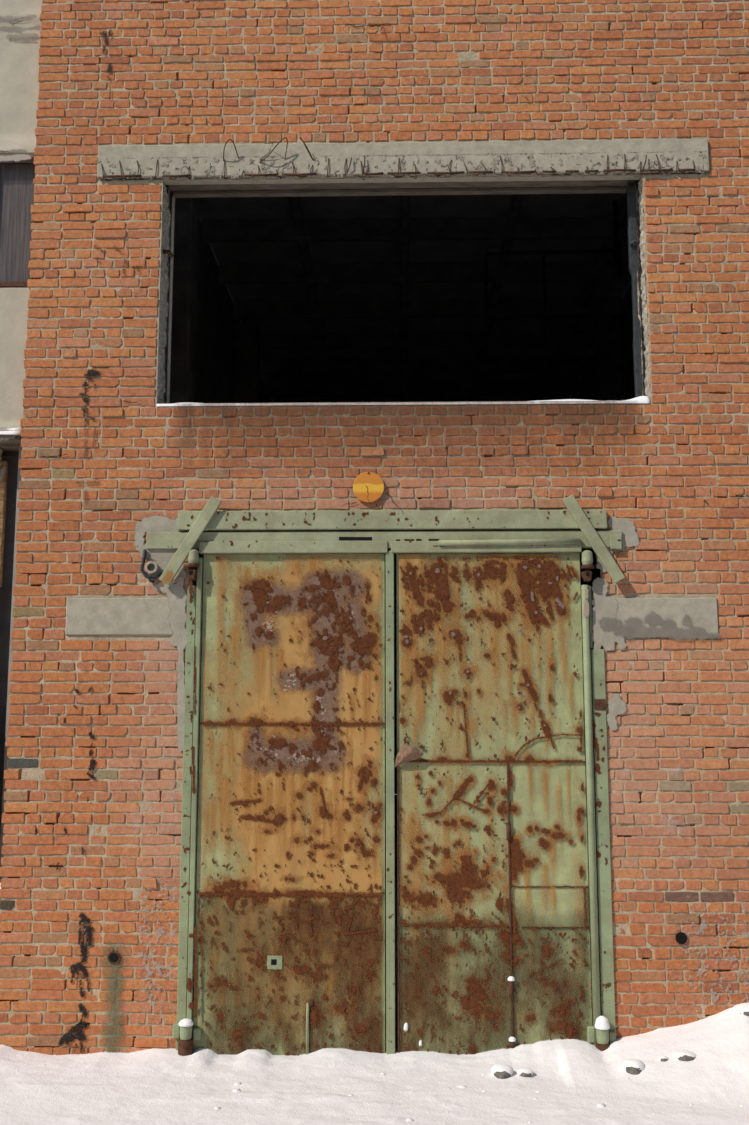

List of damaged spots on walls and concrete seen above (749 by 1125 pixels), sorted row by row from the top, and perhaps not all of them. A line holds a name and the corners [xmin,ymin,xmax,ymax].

spalling [97,151,709,181]
spalling [0,461,8,587]
rust [181,511,611,1056]